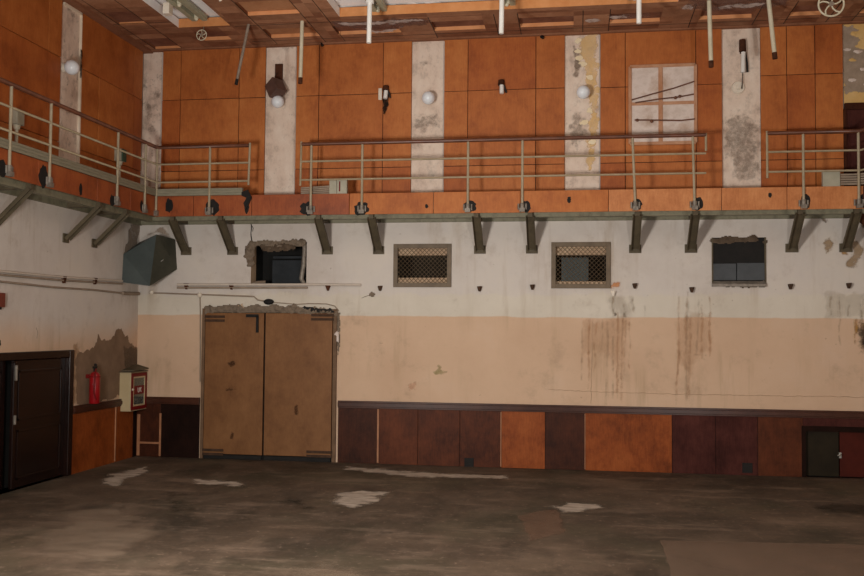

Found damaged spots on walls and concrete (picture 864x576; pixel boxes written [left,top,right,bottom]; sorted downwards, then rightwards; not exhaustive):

peeling [842,25,864,94]
peeling [574,35,600,169]
flaking render [243,239,306,267]
flaking render [204,303,340,355]
peeling [75,328,138,405]